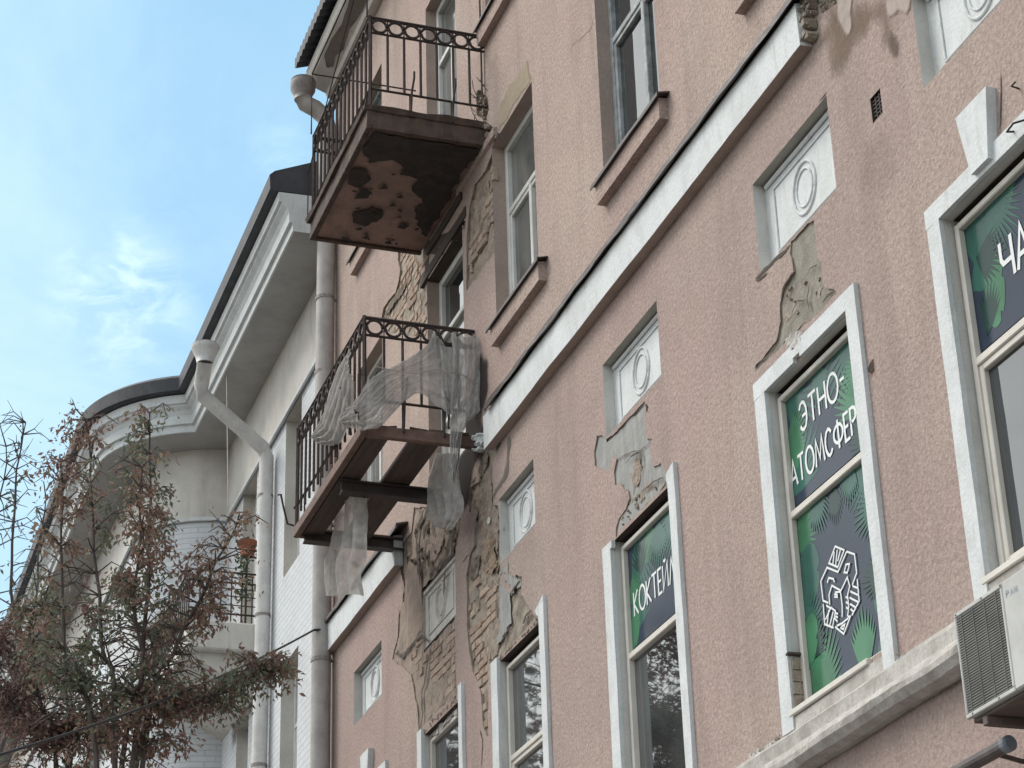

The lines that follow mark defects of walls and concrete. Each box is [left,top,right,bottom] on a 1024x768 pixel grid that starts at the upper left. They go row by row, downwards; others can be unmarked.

spalling [797,0,851,44]
peeling [886,0,910,16]
peeling [341,62,531,337]
spalling [755,222,836,371]
spalling [596,403,667,534]
spalling [393,442,539,739]